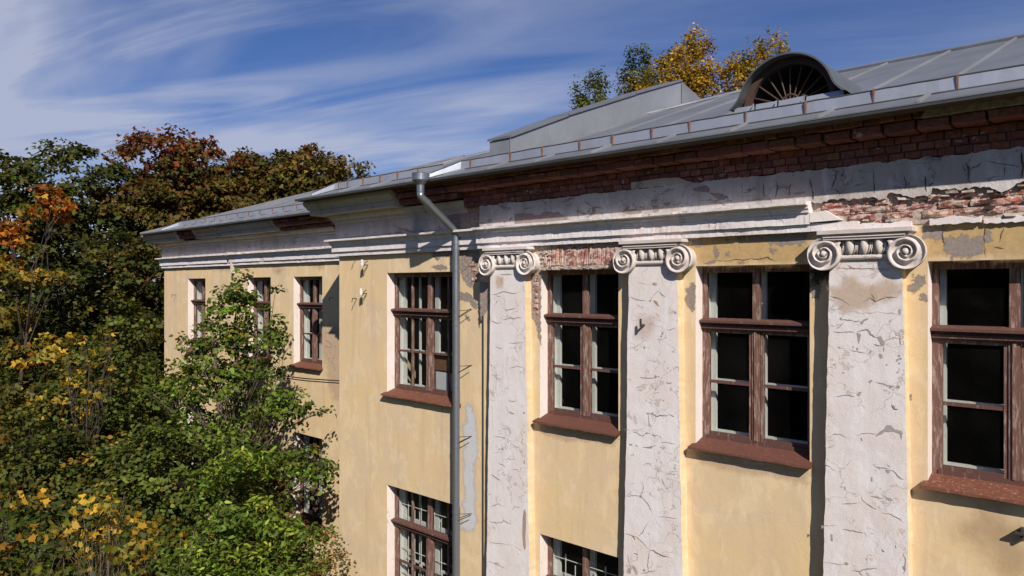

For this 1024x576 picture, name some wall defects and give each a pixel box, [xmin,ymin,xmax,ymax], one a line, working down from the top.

crack [727,172,844,223]
spalling [813,183,1024,260]
crack [966,150,1024,183]
spalling [432,250,489,321]
crack [491,274,523,380]
spalling [531,242,623,344]
crack [826,295,903,440]
peeling [906,274,928,302]
crack [623,282,676,573]
crack [821,464,906,575]